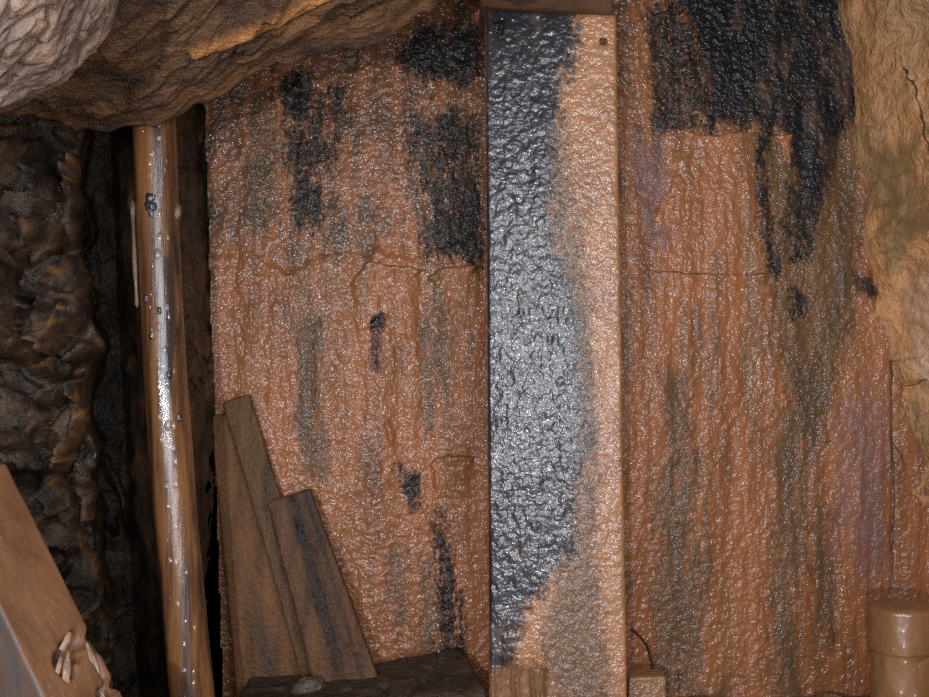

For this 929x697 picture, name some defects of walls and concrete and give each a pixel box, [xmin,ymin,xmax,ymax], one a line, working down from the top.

water stain [244,65,352,240]
crack [901,60,929,151]
water stain [395,10,596,673]
water stain [636,0,878,697]
crack [891,361,927,403]
crack [891,428,905,580]